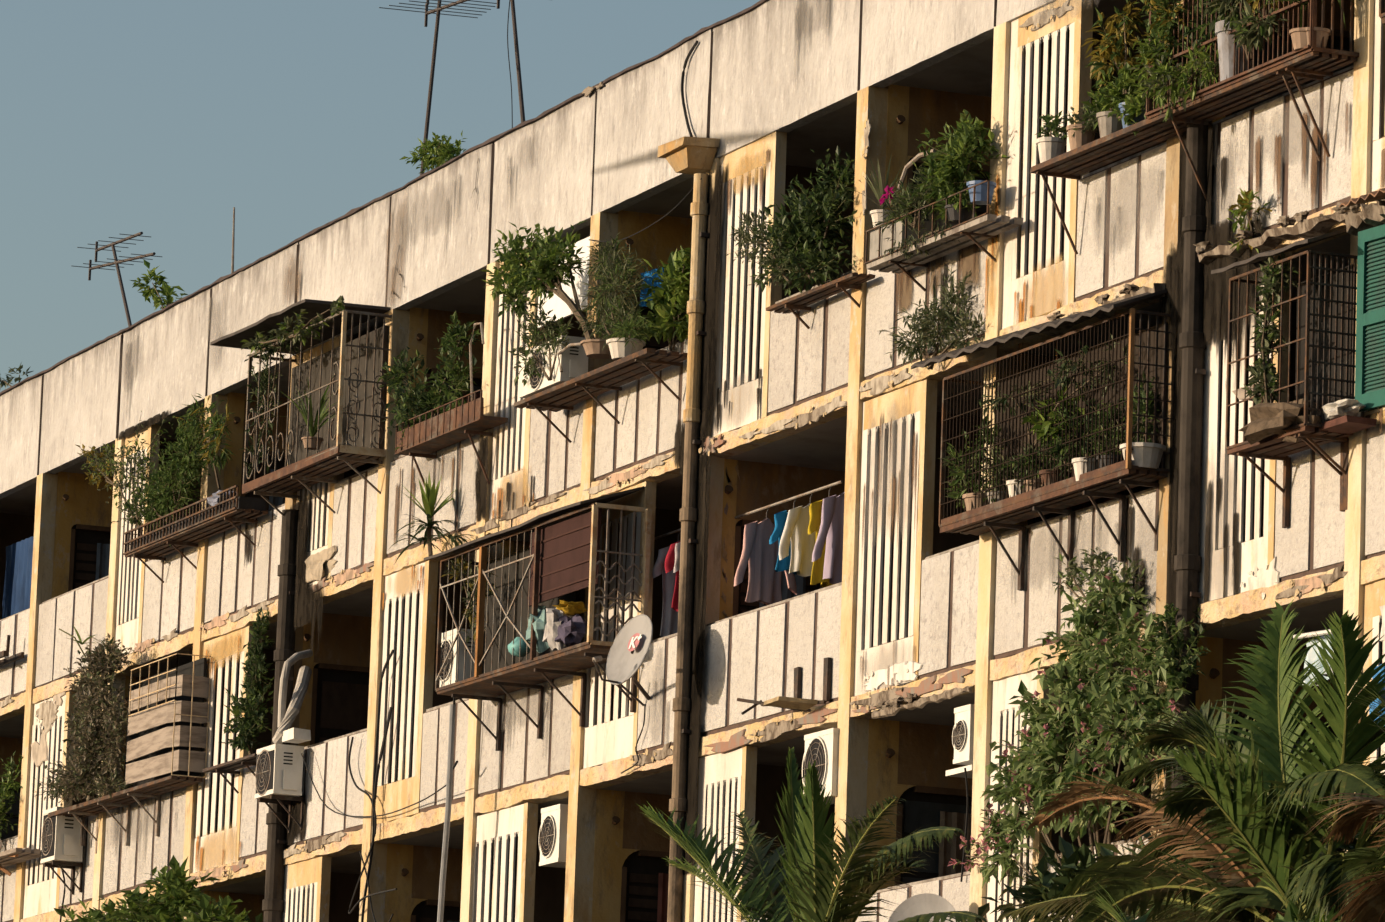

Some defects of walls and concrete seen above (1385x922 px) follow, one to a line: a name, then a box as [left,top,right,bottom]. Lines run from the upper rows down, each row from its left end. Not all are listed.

spalling [705,661,973,753]